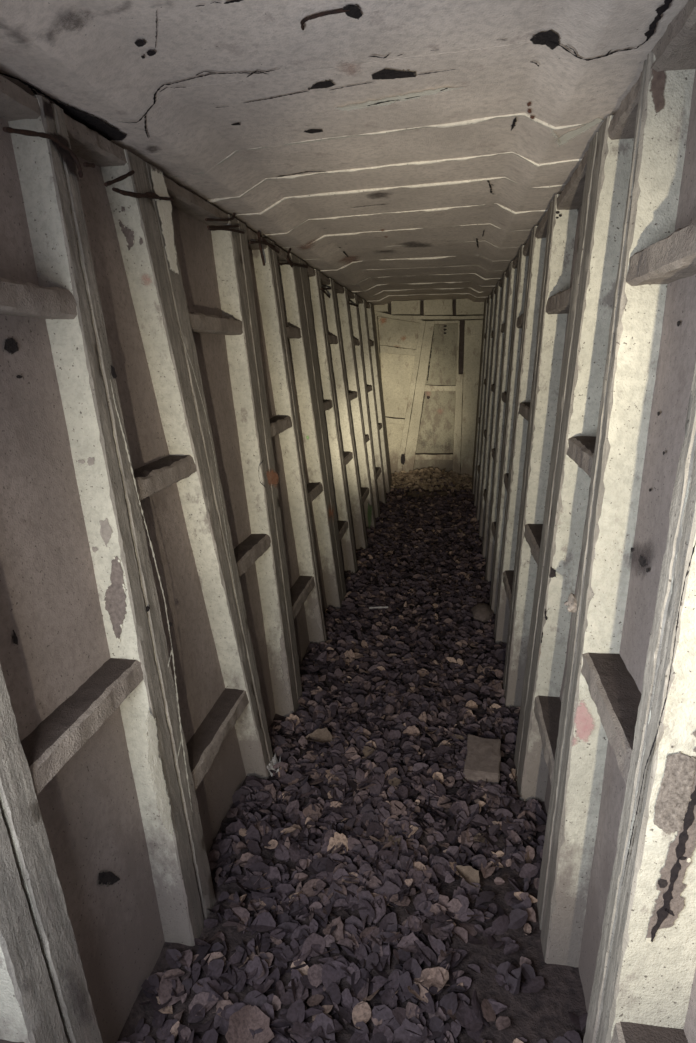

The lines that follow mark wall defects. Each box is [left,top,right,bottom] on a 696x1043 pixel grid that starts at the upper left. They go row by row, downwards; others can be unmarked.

spalling [300,4,362,30]
crack [549,0,672,61]
crack [124,69,307,139]
spalling [308,80,335,90]
spalling [372,69,416,80]
crack [332,50,456,106]
peeling [92,519,127,643]
crack [622,542,696,884]
peeling [646,731,696,943]
crack [651,786,696,942]